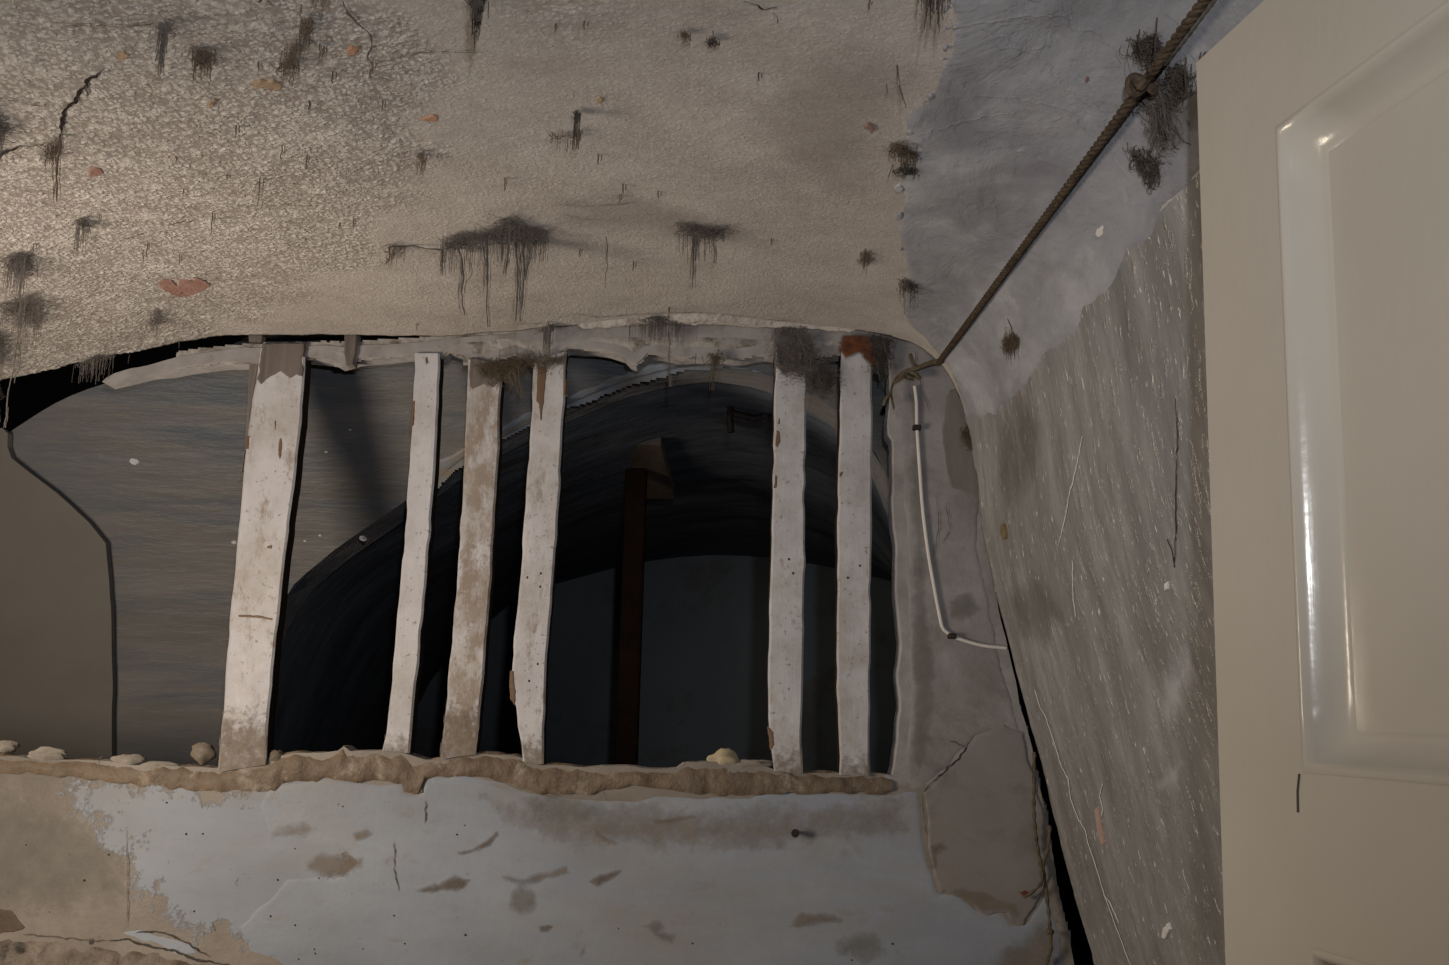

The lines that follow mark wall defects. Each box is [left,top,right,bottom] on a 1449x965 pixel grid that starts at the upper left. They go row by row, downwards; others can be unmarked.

crack [0,68,105,157]
flaking render [894,0,1264,418]
rust [838,335,880,366]